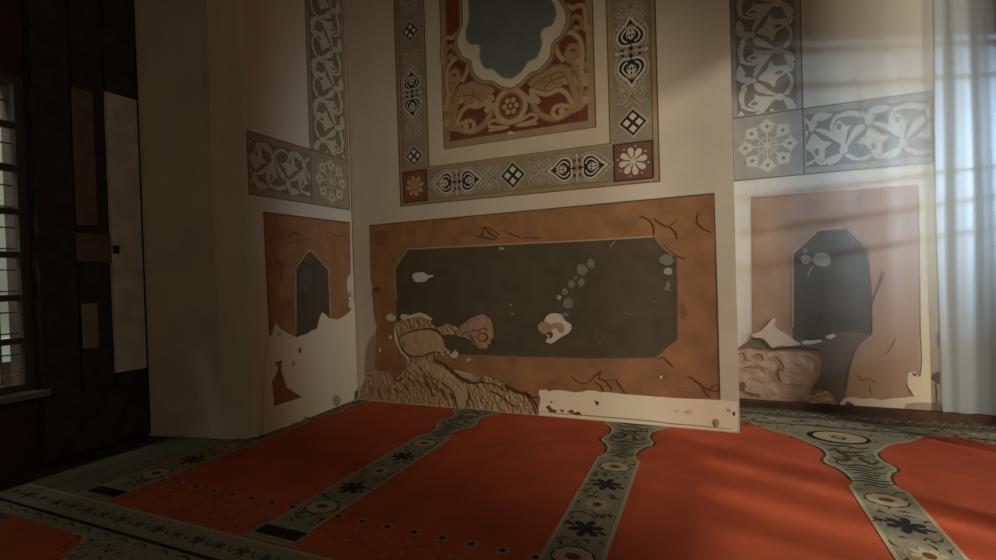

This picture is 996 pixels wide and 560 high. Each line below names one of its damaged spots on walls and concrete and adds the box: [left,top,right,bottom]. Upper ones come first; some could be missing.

crack [640,213,711,259]
peeling [263,274,836,435]